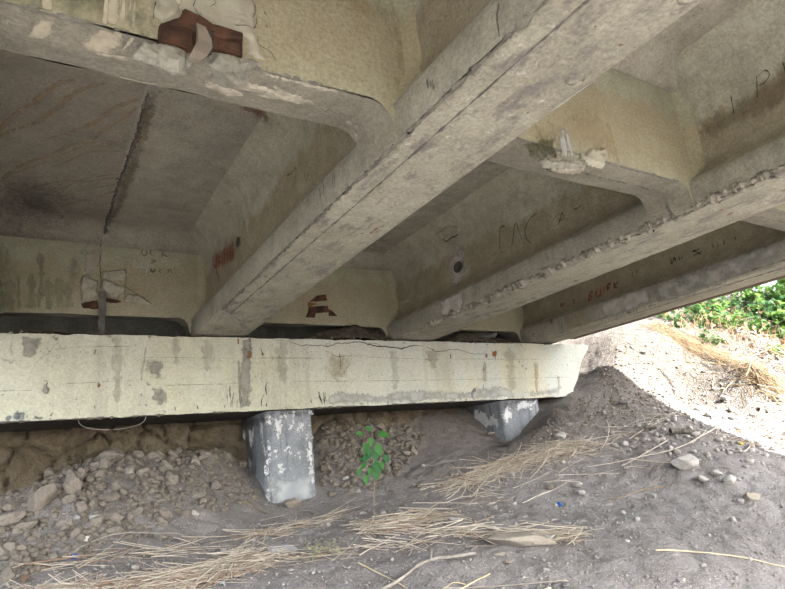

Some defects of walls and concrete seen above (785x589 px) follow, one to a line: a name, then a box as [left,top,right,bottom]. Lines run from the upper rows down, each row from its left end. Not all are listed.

rust [157,9,243,58]
spalling [132,41,194,77]
spalling [208,52,262,88]
crack [104,93,153,235]
spalling [538,148,608,175]
water stain [23,337,39,357]
water stain [215,291,251,407]
crack [265,337,474,357]
water stain [141,348,166,405]